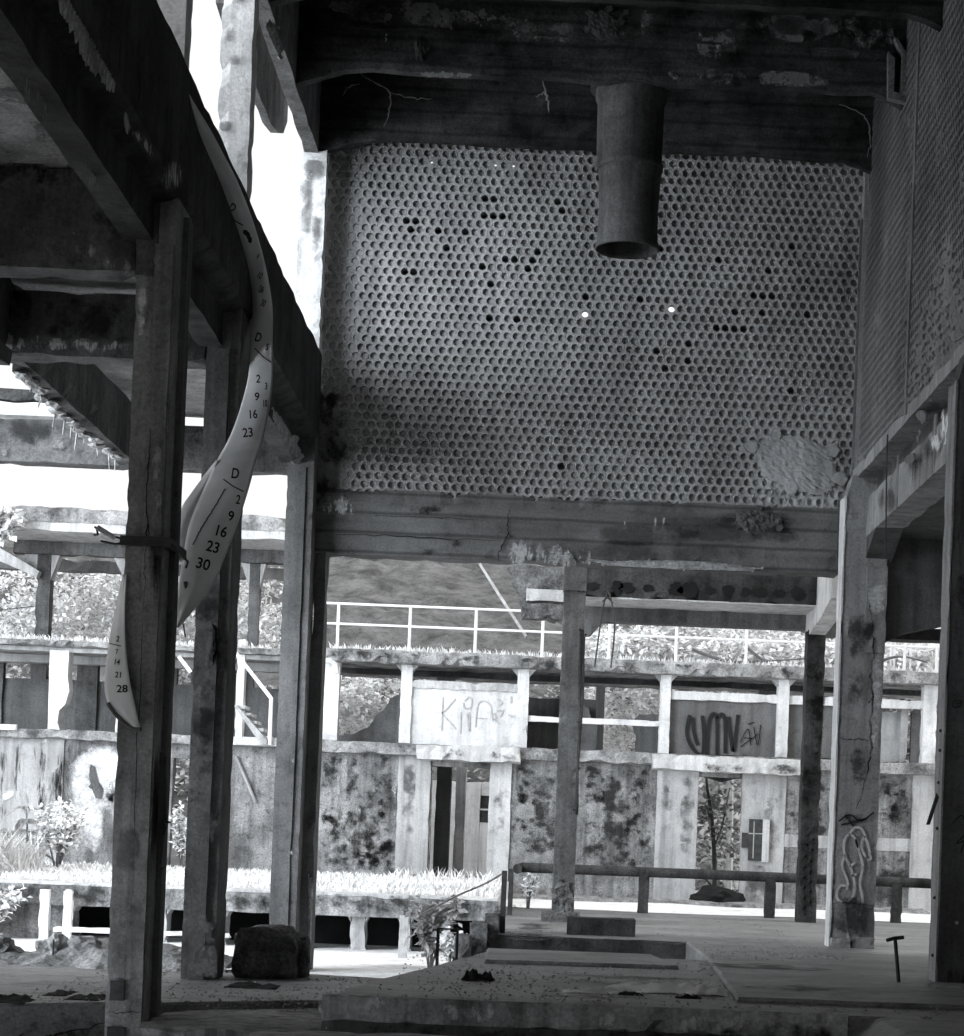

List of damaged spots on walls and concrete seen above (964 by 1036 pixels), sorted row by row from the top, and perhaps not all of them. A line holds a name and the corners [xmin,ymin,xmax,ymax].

crack [342,74,428,125]
crack [839,104,871,158]
spalling [14,371,124,471]
crack [336,509,512,559]
damp [848,616,873,656]
crack [839,605,875,806]
damp [850,749,865,782]
damp [322,756,415,874]
damp [516,766,555,853]
damp [583,766,650,866]
damp [834,897,867,938]
crack [19,1003,143,1036]